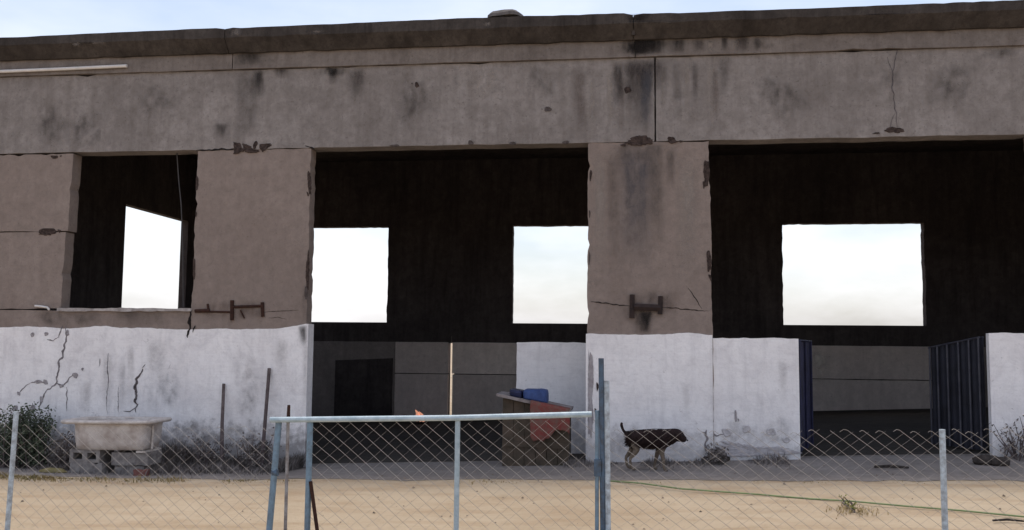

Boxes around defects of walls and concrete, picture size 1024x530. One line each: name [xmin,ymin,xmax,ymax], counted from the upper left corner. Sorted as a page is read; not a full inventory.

crack [887,50,898,127]
spalling [233,141,272,154]
spalling [621,135,653,146]
spalling [38,228,61,236]
crack [663,288,703,311]
crack [186,311,195,338]
crack [20,325,72,409]
crack [99,353,145,413]